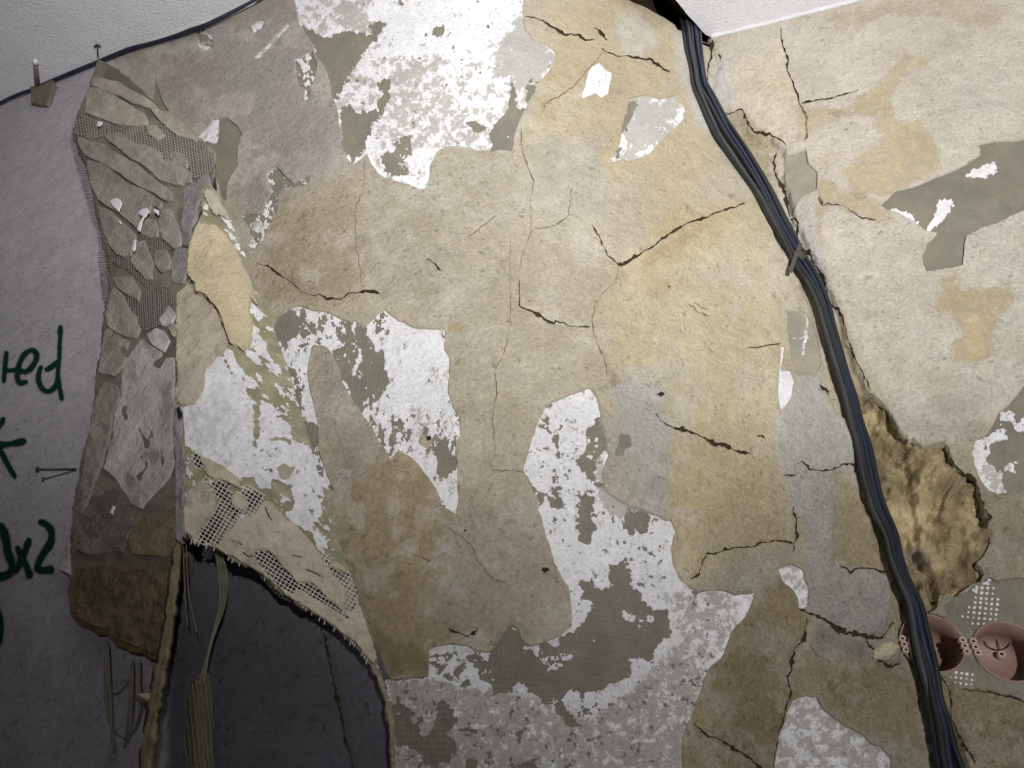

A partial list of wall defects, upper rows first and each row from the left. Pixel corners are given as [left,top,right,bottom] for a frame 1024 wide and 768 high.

peeling [255,0,555,189]
crack [524,16,670,113]
crack [707,40,721,80]
crack [256,163,396,300]
crack [726,27,875,391]
peeling [881,140,1024,271]
crack [469,132,746,500]
peeling [58,60,755,768]
crack [656,413,765,454]
crack [785,461,856,477]
crack [691,507,799,579]